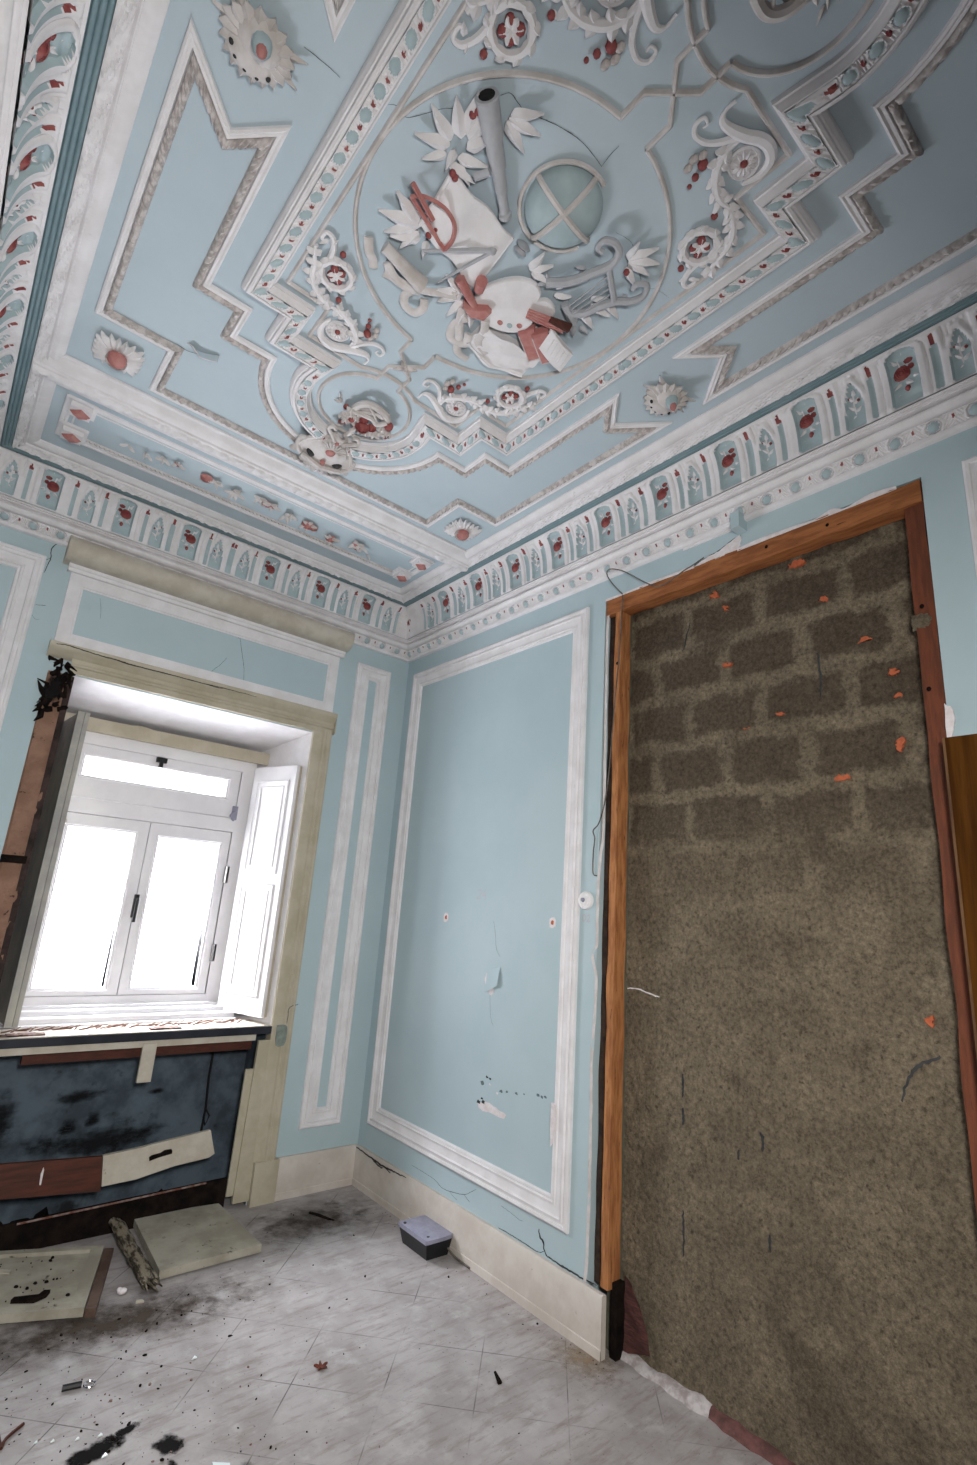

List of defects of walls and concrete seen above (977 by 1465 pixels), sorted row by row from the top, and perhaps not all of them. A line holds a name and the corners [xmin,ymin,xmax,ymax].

flaking render [0,655,77,983]
spalling [477,1076,557,1146]